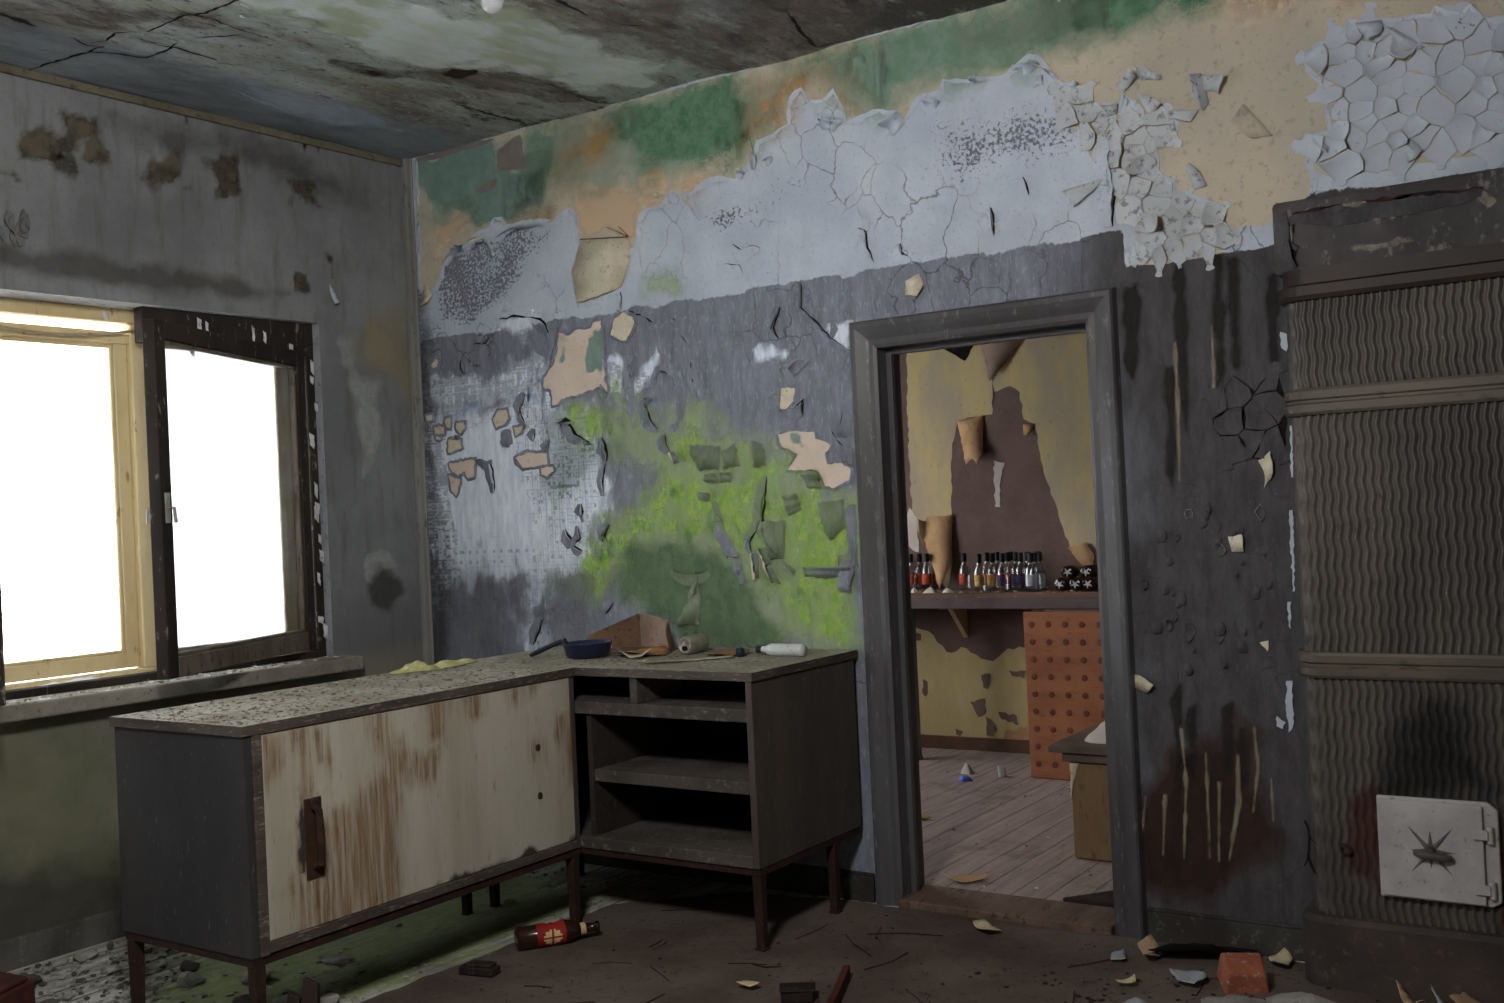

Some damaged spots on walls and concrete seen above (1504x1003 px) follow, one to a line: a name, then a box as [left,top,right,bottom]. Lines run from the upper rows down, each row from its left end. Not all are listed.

crack [28,0,275,70]
flaking render [19,112,109,176]
peeling [412,0,1504,409]
leakage [240,0,1209,664]
leakage [1213,255,1240,381]
leakage [1266,273,1280,362]
peeling [424,407,557,499]
peeling [668,359,858,592]
peeling [1214,523,1267,558]
flaking render [1287,510,1295,629]
flaking render [1276,681,1294,732]
corrosion [1142,685,1277,896]